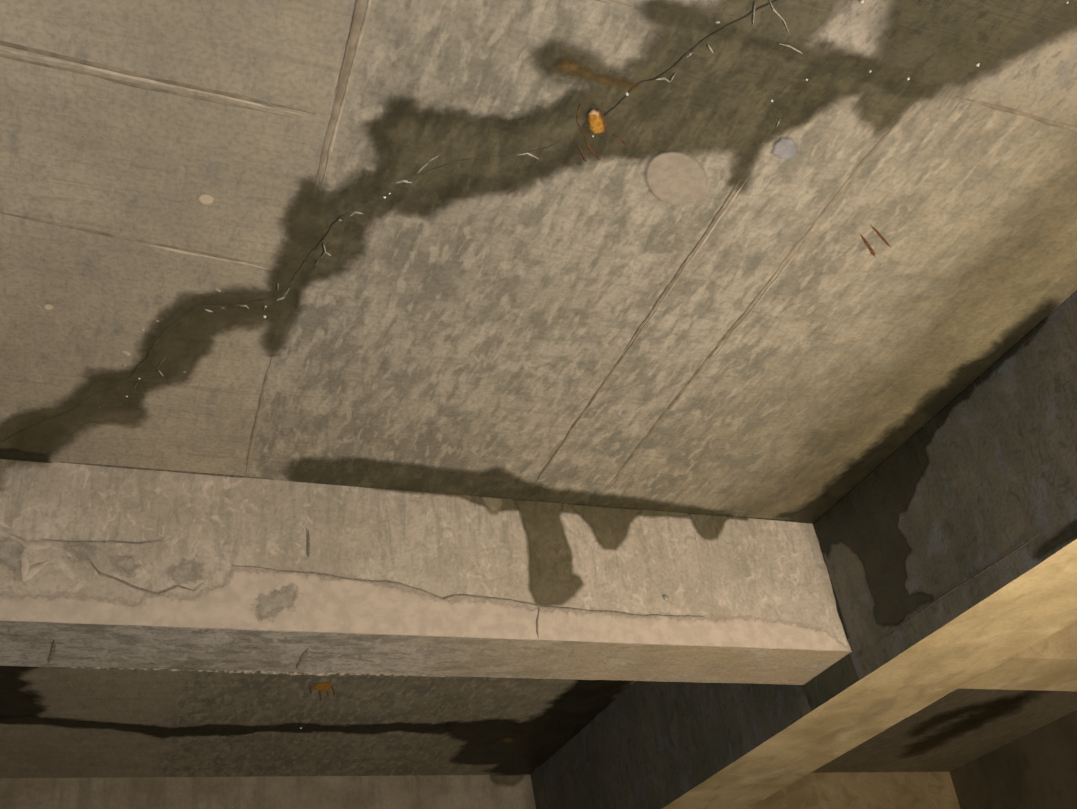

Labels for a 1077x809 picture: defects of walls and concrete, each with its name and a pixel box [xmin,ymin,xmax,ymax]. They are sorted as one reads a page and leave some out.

corrosion [577,105,629,163]
water stain [0,0,1077,475]
corrosion [860,226,891,258]
water stain [288,163,1077,626]
crack [41,539,205,595]
spalling [256,585,297,620]
crack [236,529,701,638]
water stain [802,575,858,710]
water stain [0,666,44,718]
water stain [448,680,631,785]
water stain [907,692,1036,755]